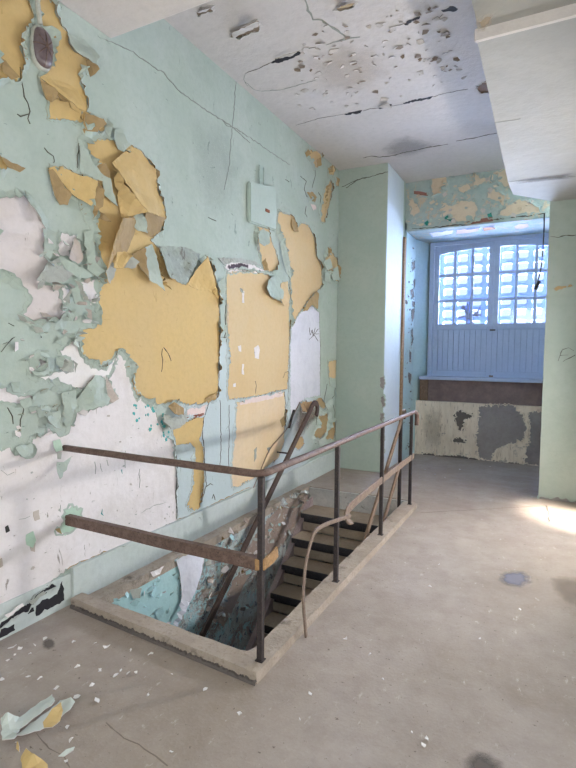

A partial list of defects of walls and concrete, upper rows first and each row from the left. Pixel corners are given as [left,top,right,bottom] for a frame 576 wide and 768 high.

flaking render [0,0,341,686]